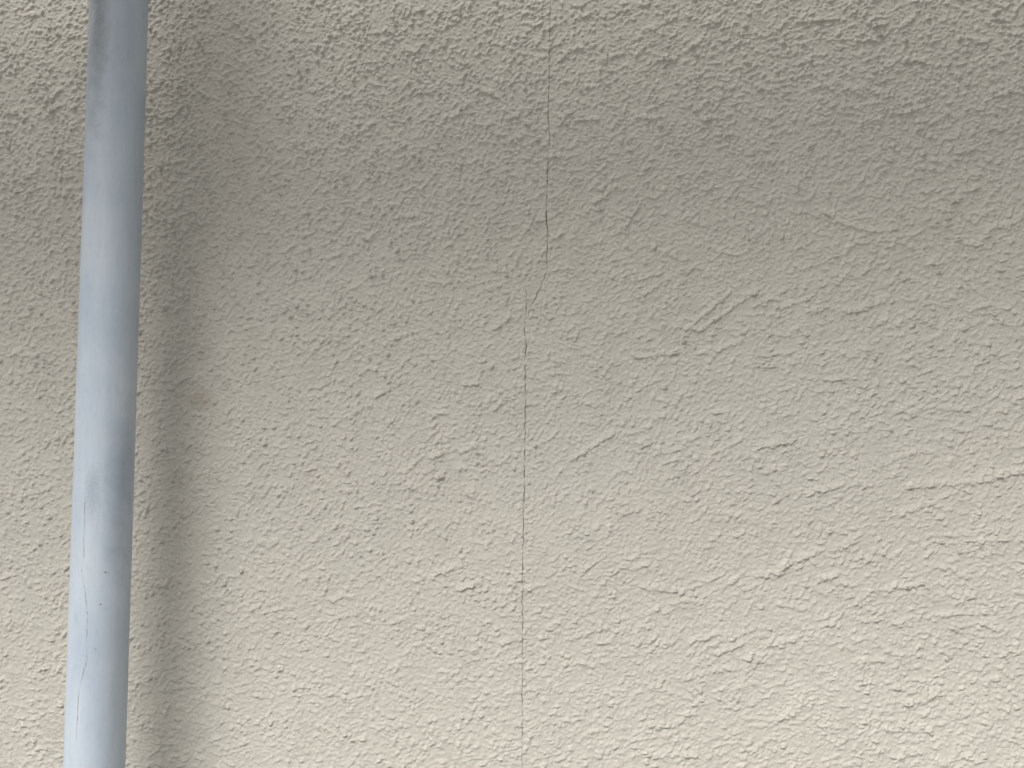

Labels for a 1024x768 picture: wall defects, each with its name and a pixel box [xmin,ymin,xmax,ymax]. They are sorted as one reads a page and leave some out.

crack [521,5,577,734]